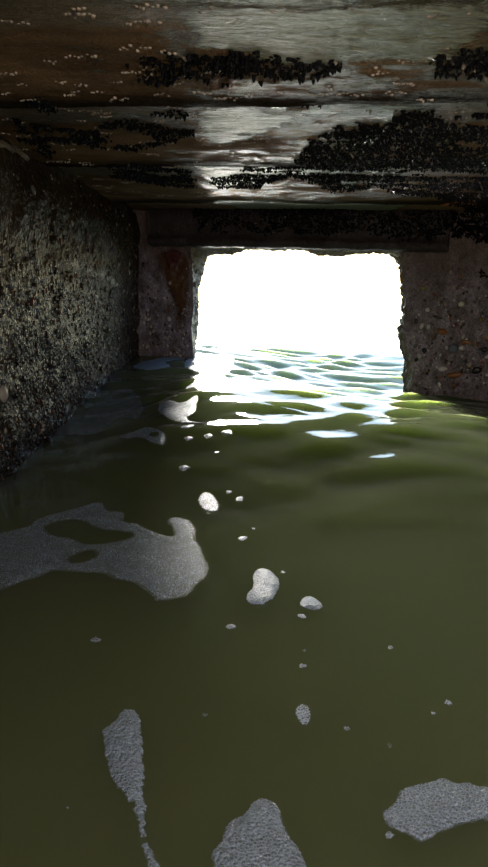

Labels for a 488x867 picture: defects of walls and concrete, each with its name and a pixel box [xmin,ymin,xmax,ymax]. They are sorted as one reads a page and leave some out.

corrosion [159,250,189,325]